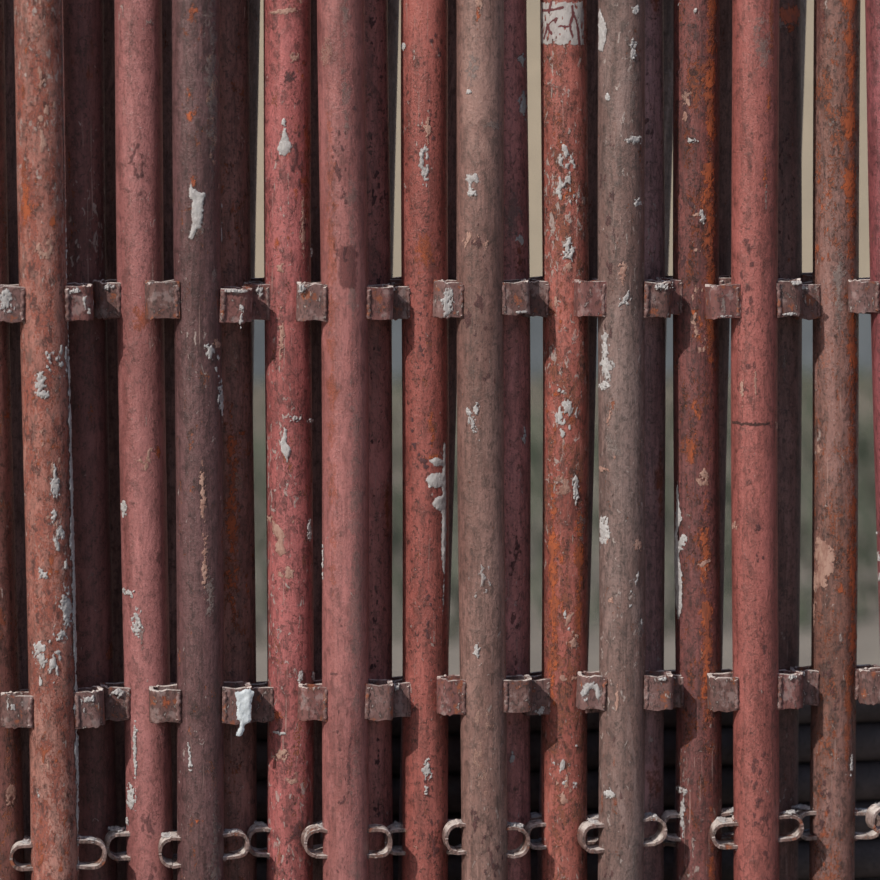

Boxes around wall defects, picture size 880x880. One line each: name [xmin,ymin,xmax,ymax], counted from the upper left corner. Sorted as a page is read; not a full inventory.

rust [700,0,718,285]
rust [831,0,858,299]
rust [546,483,564,706]
rust [697,527,713,722]
rust [832,313,858,767]